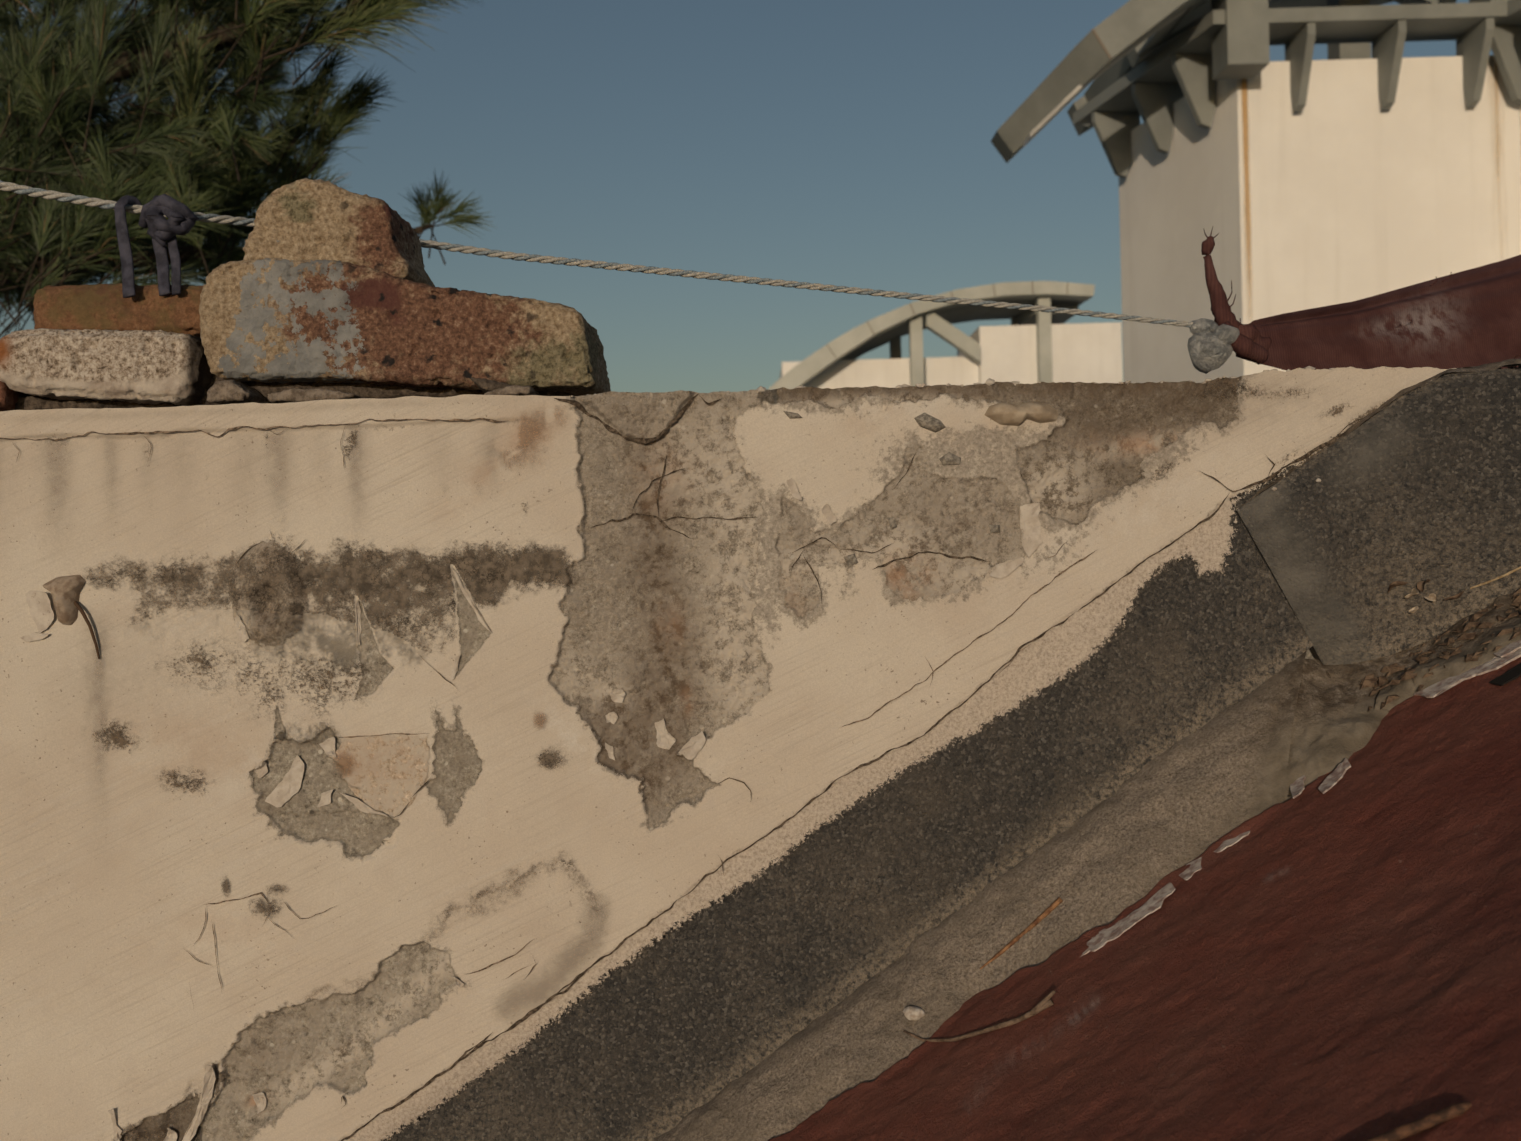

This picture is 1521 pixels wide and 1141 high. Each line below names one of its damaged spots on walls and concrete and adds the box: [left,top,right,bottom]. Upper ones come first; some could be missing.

crack [554,394,755,539]
water stain [84,539,573,651]
spalling [548,376,1245,830]
spalling [249,706,482,858]
crack [332,417,1365,1141]
crack [184,892,337,1001]
spalling [108,941,464,1141]